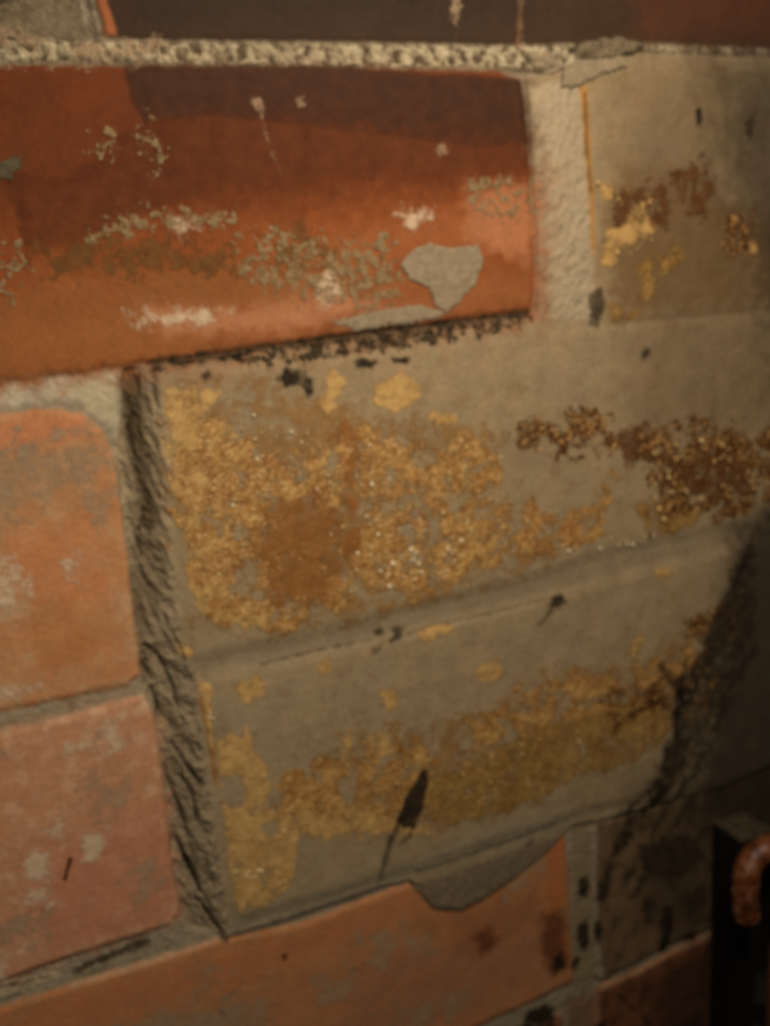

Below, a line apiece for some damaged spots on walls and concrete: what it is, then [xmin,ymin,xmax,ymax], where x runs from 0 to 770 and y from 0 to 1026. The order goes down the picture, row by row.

peeling [83,125,118,163]
peeling [133,108,170,179]
peeling [467,174,538,225]
leakage [137,308,215,327]
peeling [0,202,452,332]
leakage [315,270,343,306]
flaking render [160,368,770,645]
flaking render [199,682,442,915]